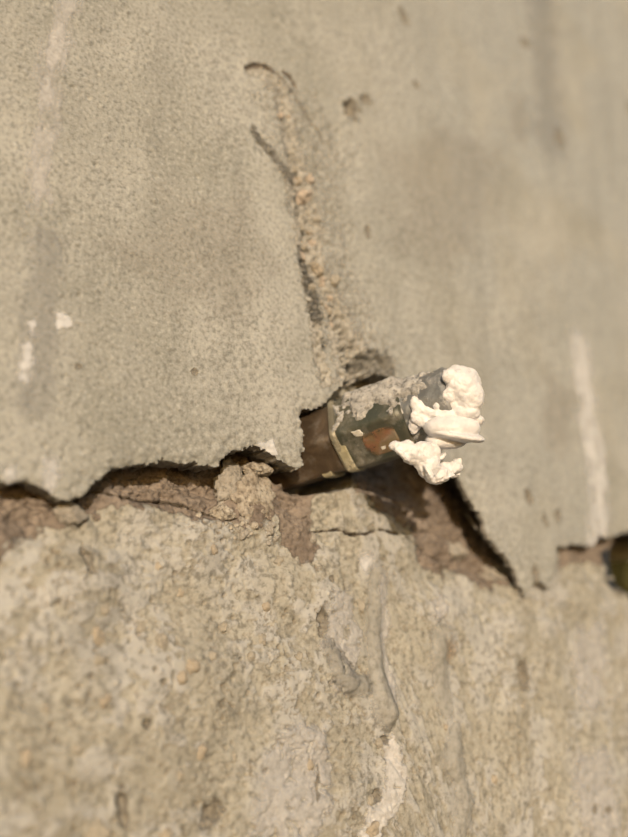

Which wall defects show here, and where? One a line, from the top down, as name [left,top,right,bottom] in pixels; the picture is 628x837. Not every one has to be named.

crack [244,63,324,143]
crack [73,492,209,516]
spalling [0,445,320,564]
spalling [337,458,526,597]
spalling [80,543,97,574]
crack [313,528,457,583]
spalling [532,564,551,590]
spalling [557,532,628,569]
hole [316,606,328,637]
hole [516,658,530,691]
hole [115,783,129,828]
hole [199,798,225,830]